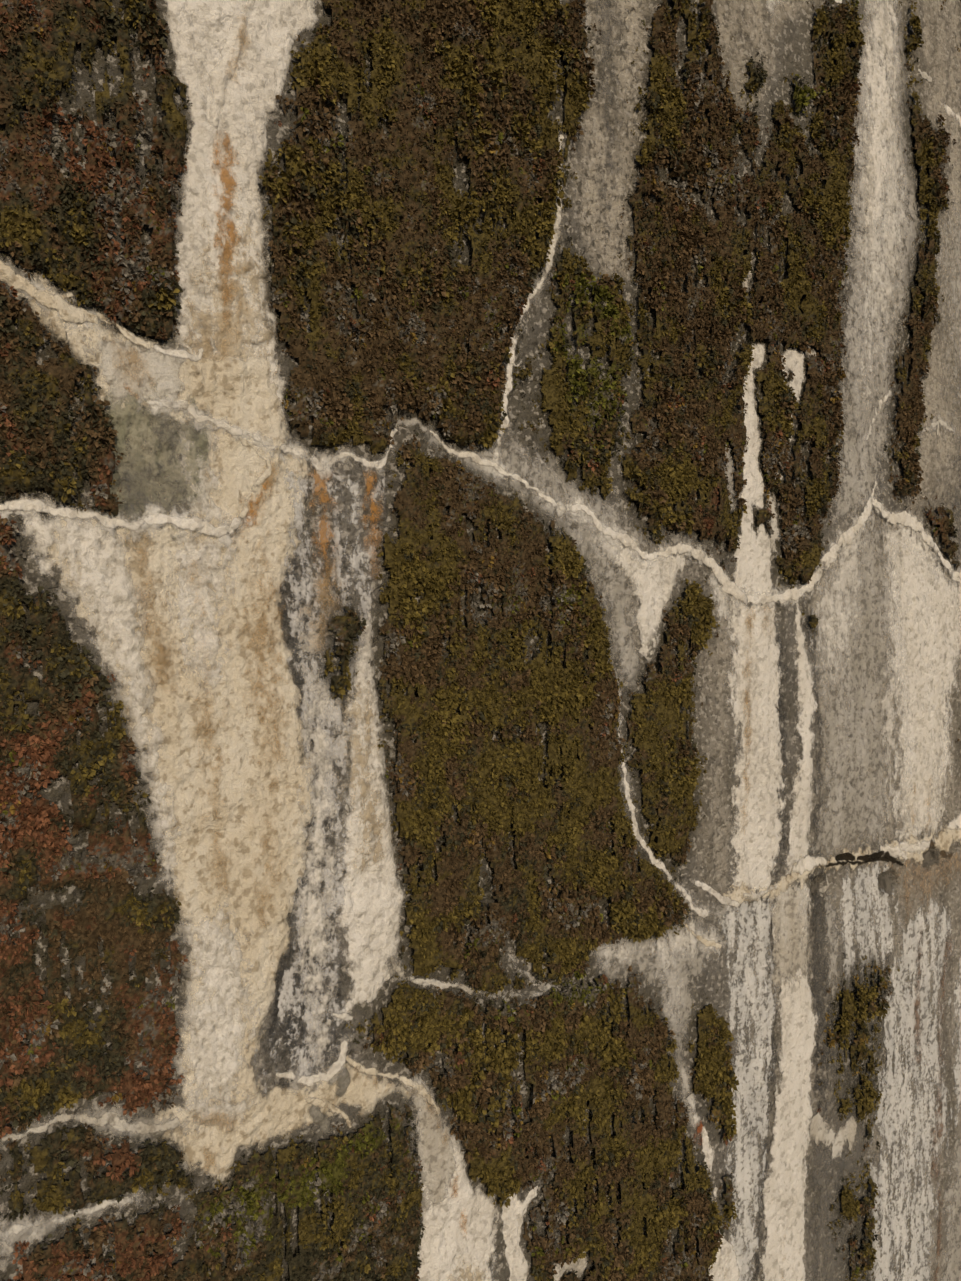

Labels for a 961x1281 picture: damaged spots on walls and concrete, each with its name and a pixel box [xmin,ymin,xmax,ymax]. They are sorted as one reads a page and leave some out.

crack [584,9,592,32]
rust [215,135,236,266]
crack [0,130,961,608]
water stain [0,0,538,1281]
water stain [461,0,961,1281]
crack [617,680,740,949]
crack [819,857,889,897]
crack [387,950,558,999]
crack [0,1098,188,1150]
crack [276,1013,440,1128]
crack [0,1193,143,1254]